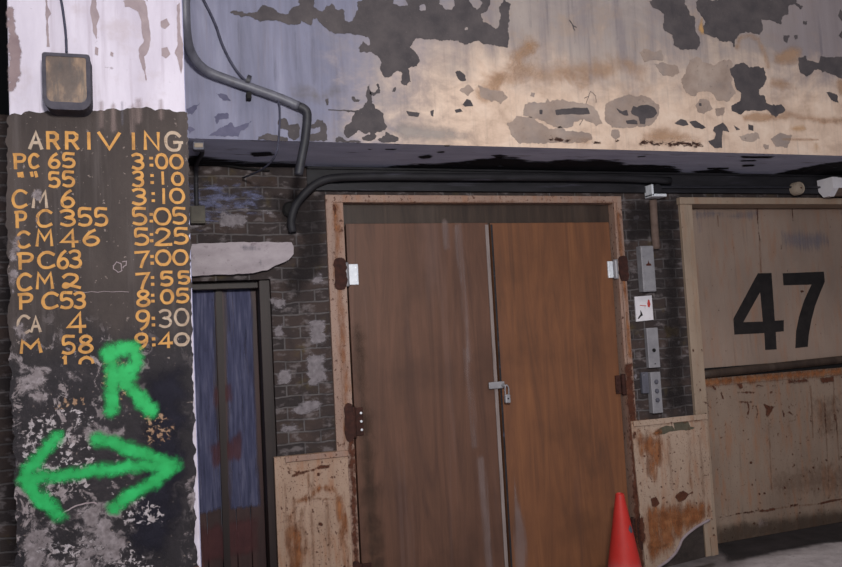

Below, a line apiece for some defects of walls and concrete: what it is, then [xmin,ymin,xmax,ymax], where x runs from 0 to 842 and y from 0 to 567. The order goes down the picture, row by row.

peeling [230,0,511,143]
peeling [640,0,803,149]
peeling [798,56,842,79]
peeling [209,113,251,137]
peeling [507,92,660,144]
rust [700,368,842,391]
rust [624,319,705,567]
rust [303,440,359,562]
spalling [657,519,710,567]